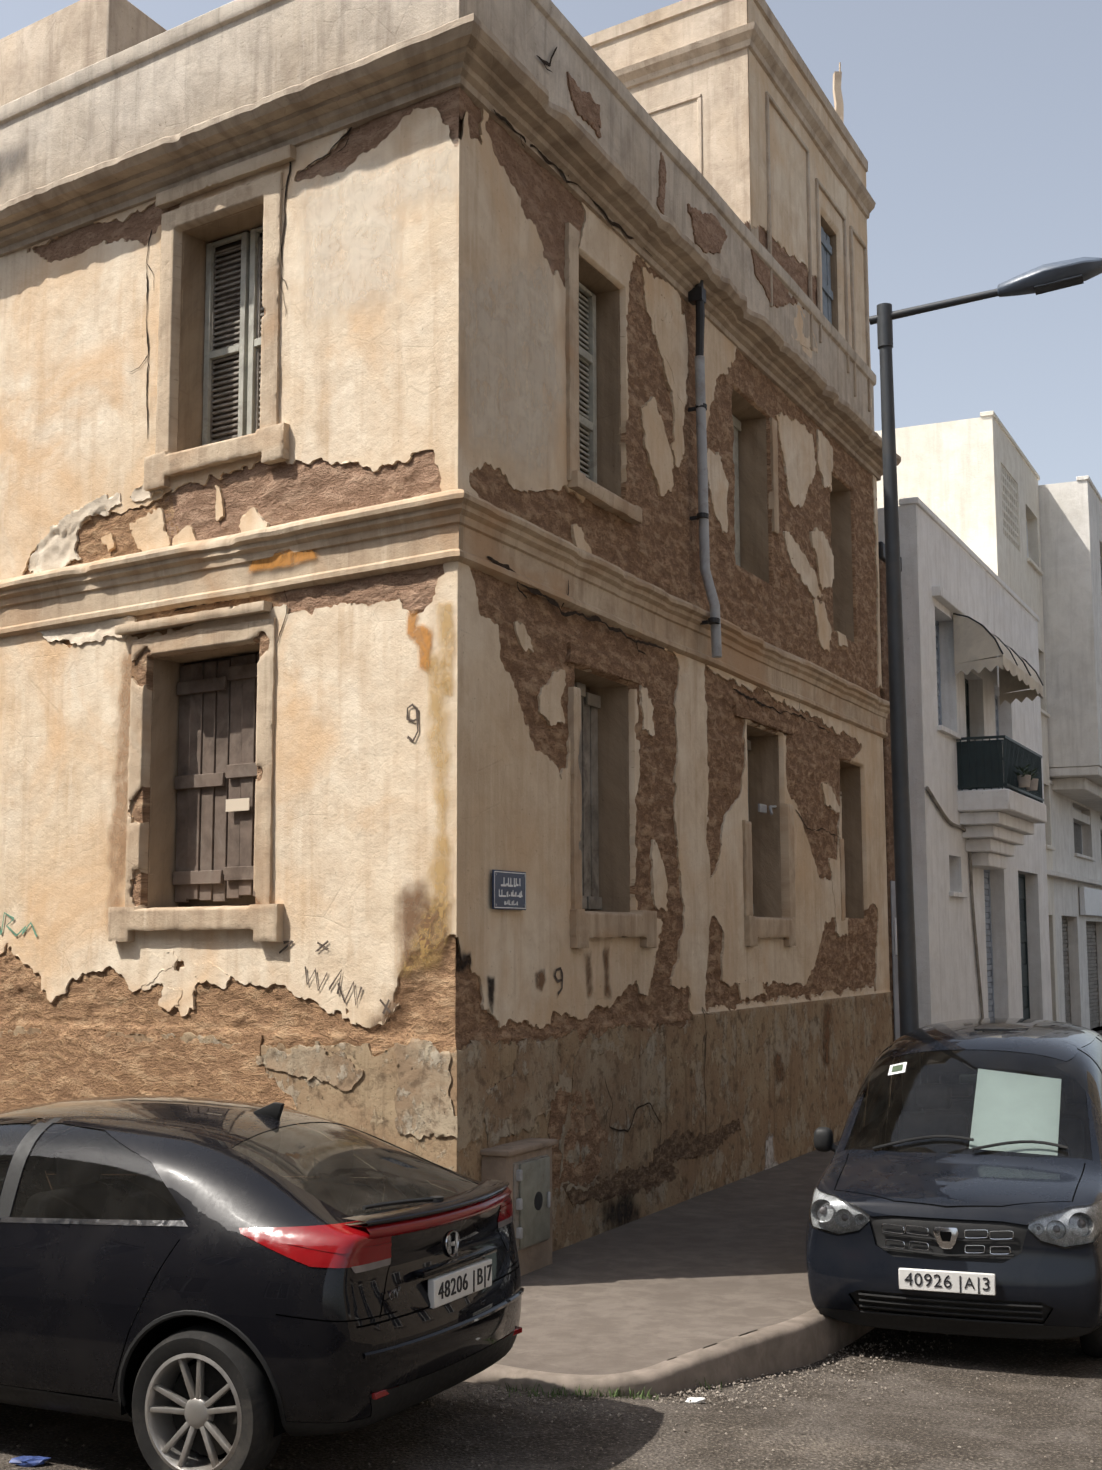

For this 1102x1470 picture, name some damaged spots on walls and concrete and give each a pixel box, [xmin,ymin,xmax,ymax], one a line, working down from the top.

crack [131,230,154,439]
spalling [296,87,584,287]
peeling [566,72,601,138]
peeling [687,203,727,254]
spalling [745,220,818,353]
spalling [24,450,442,575]
spalling [469,256,882,698]
corrosion [407,612,432,671]
damp [405,604,452,969]
spalling [0,564,878,1206]